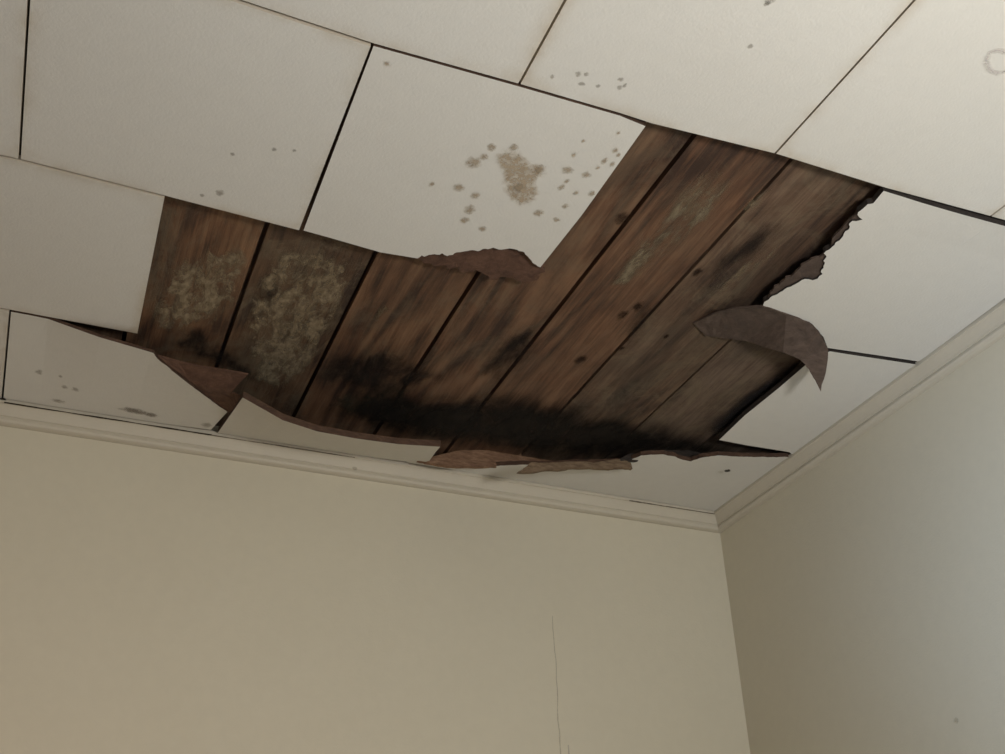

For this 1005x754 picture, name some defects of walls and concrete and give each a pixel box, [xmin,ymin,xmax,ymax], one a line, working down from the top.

leakage [468,144,542,203]
leakage [157,253,346,385]
leakage [334,354,711,456]
leakage [713,366,797,433]